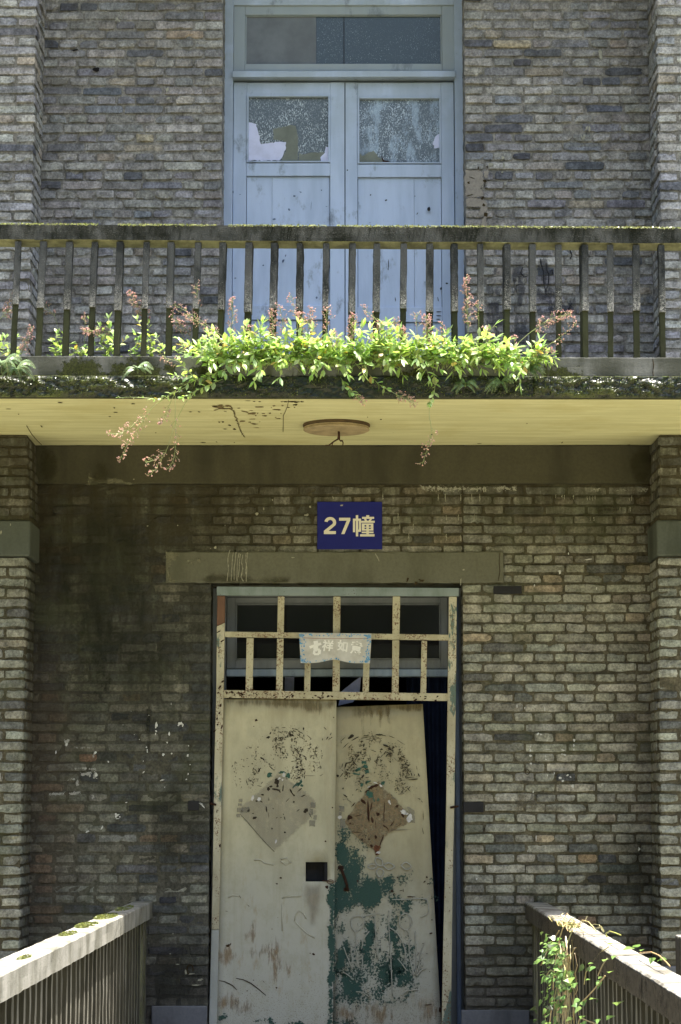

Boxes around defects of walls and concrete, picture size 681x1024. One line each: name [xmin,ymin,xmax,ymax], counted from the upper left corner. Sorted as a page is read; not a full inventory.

peeling [232,726,420,819]
peeling [326,825,439,1024]